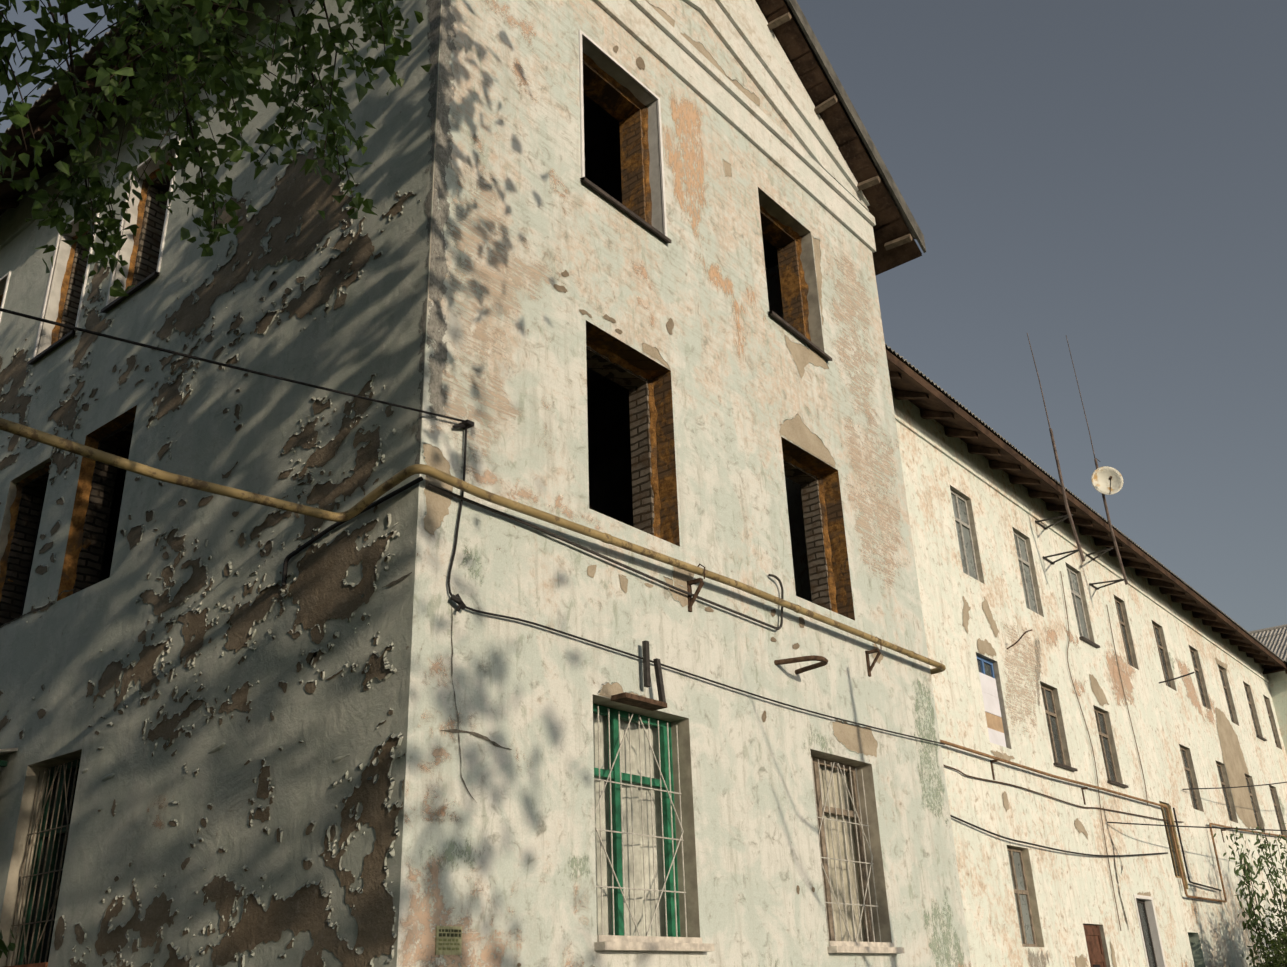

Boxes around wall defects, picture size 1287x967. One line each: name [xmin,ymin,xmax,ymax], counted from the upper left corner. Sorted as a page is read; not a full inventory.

peeling [0,338,41,470]
peeling [35,258,121,575]
peeling [112,0,569,535]
peeling [579,309,623,334]
peeling [86,370,400,777]
peeling [54,708,521,967]
flaking render [1075,954,1088,967]